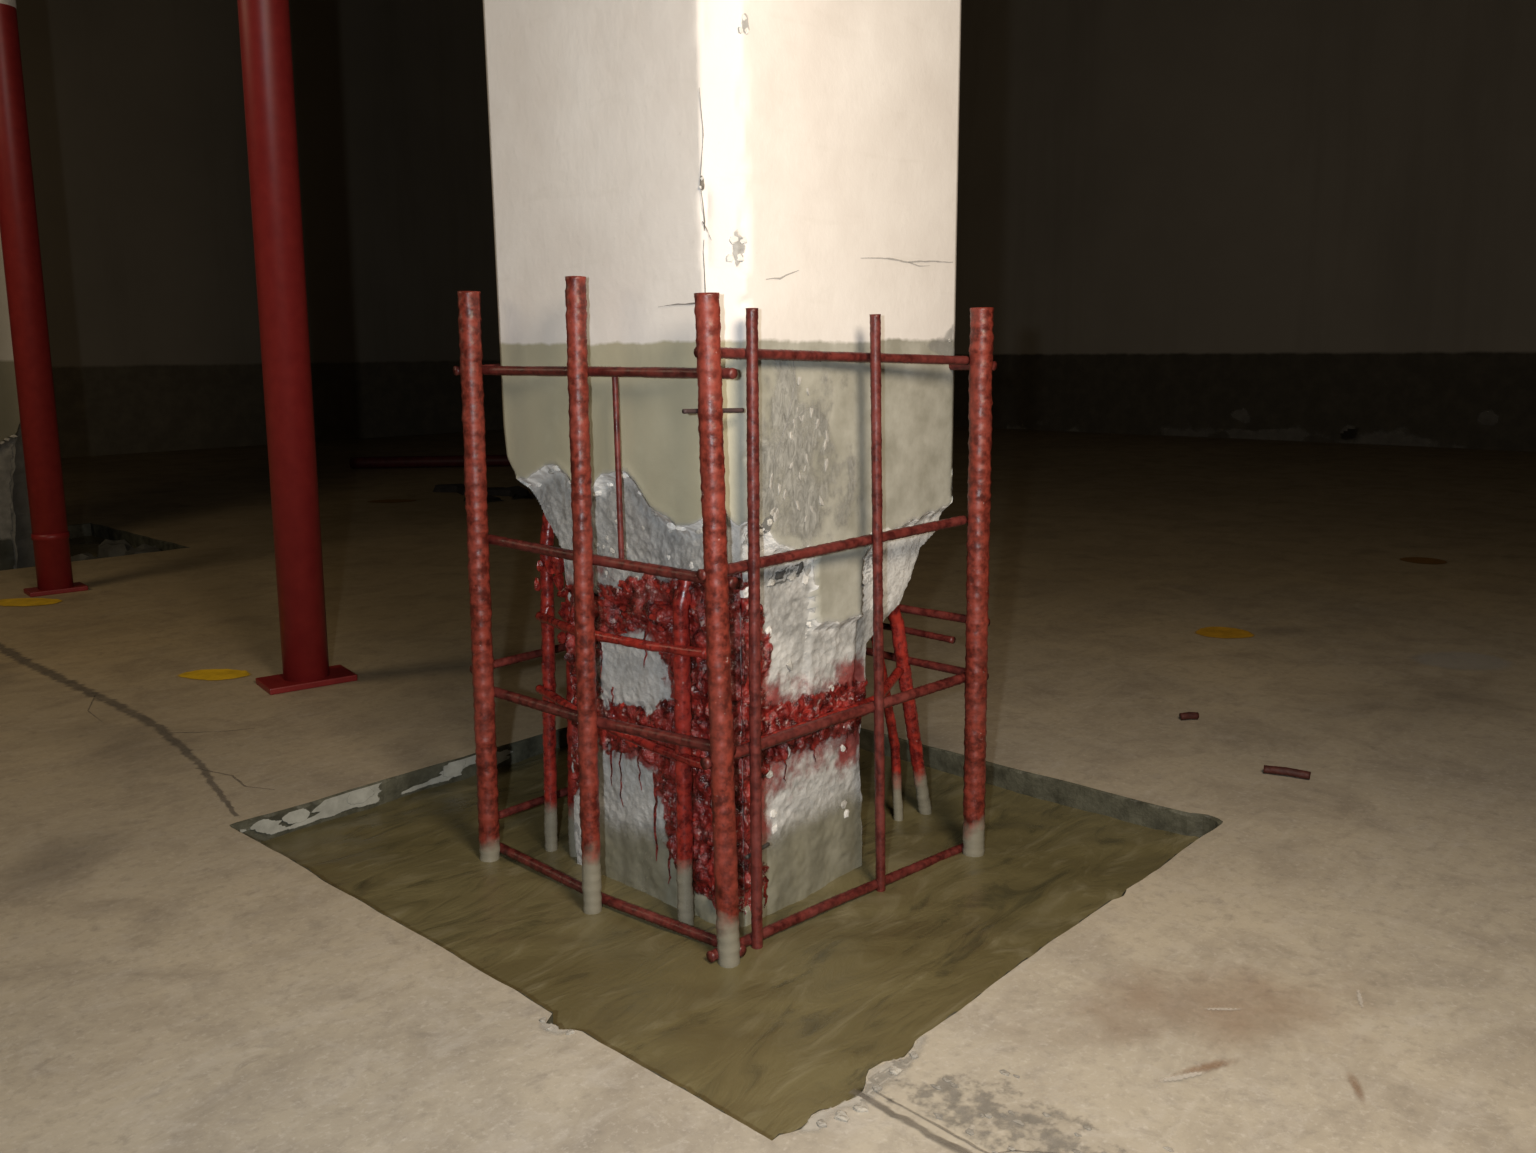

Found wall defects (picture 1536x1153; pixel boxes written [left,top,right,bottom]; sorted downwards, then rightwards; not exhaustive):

spalling [0,435,17,541]
crack [5,649,245,815]
corrosion [534,557,580,796]
spalling [518,464,707,926]
corrosion [594,569,716,909]
corrosion [728,572,868,915]
spalling [726,360,948,845]